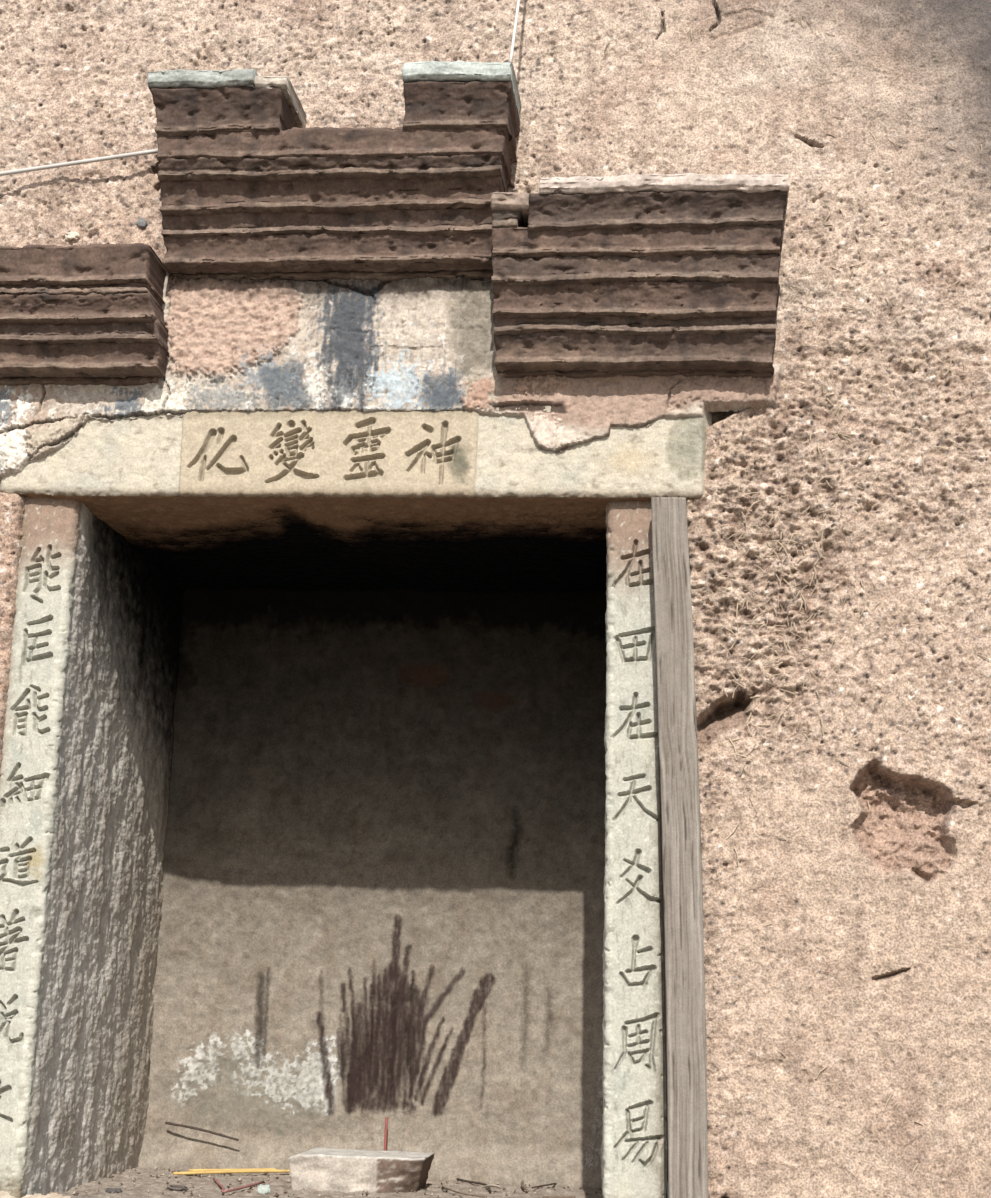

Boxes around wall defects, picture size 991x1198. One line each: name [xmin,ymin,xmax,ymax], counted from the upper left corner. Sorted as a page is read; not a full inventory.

crack [655,11,666,40]
crack [709,0,722,32]
peeling [103,273,586,449]
leakage [220,276,492,412]
peeling [0,385,89,481]
spalling [848,758,978,885]
leakage [171,1029,340,1116]